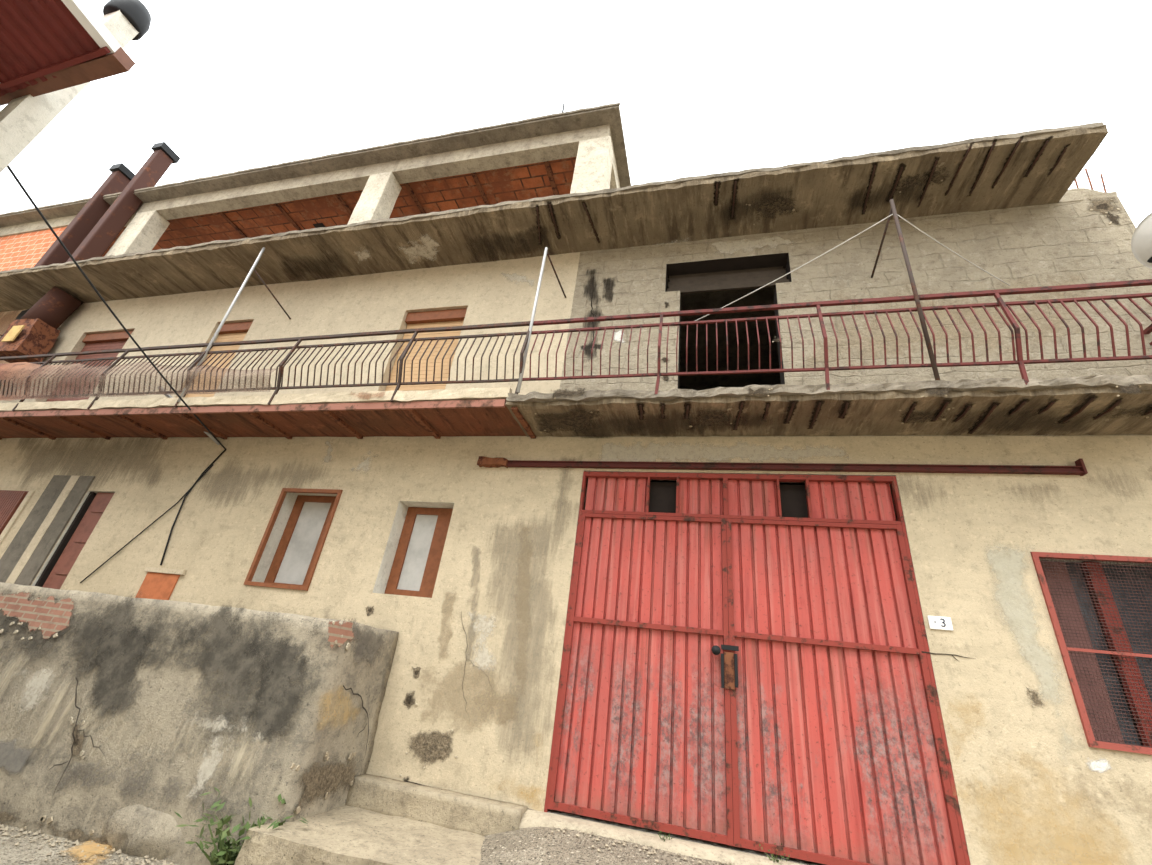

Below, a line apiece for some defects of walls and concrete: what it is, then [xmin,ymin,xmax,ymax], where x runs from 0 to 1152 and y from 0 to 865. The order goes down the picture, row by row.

leakage [584,269,614,358]
flaking render [0,591,74,640]
flaking render [328,620,355,650]
crack [48,678,106,799]
leakage [181,636,305,795]